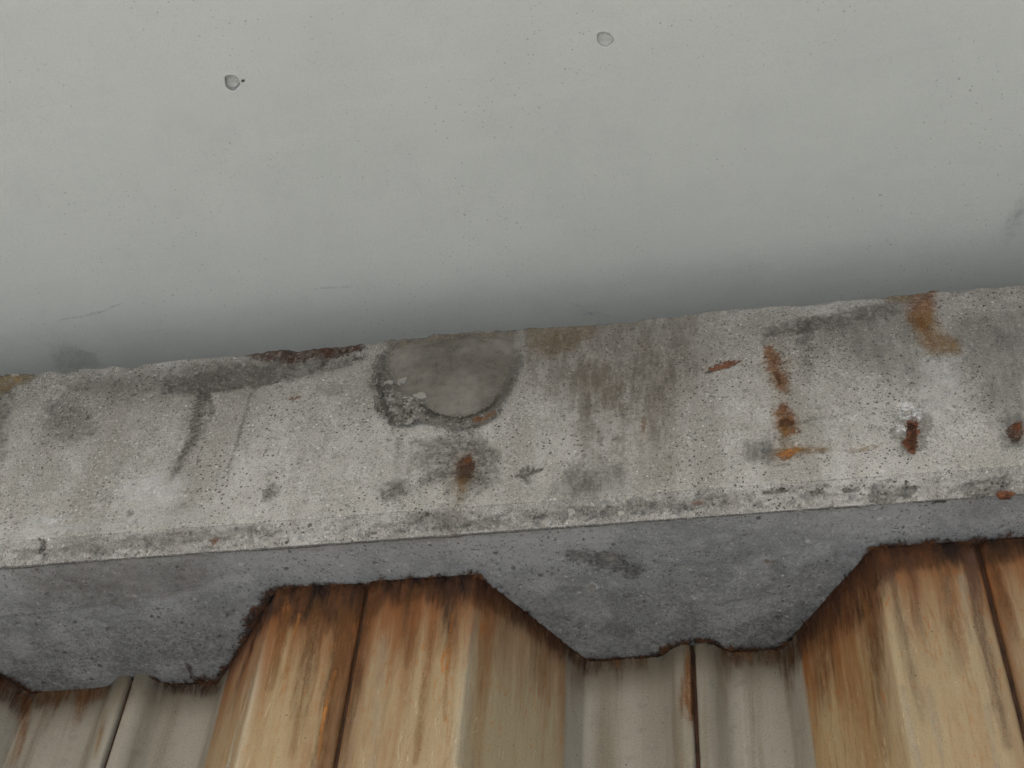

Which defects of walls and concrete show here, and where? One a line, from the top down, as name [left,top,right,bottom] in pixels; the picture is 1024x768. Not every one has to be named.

rust [887,291,959,352]
rust [246,344,365,363]
rust [705,358,741,373]
rust [764,347,790,389]
rust [776,404,800,436]
rust [890,407,933,454]
rust [1004,415,1024,446]
rust [457,443,474,483]
rust [776,447,810,460]
rust [151,531,1024,751]